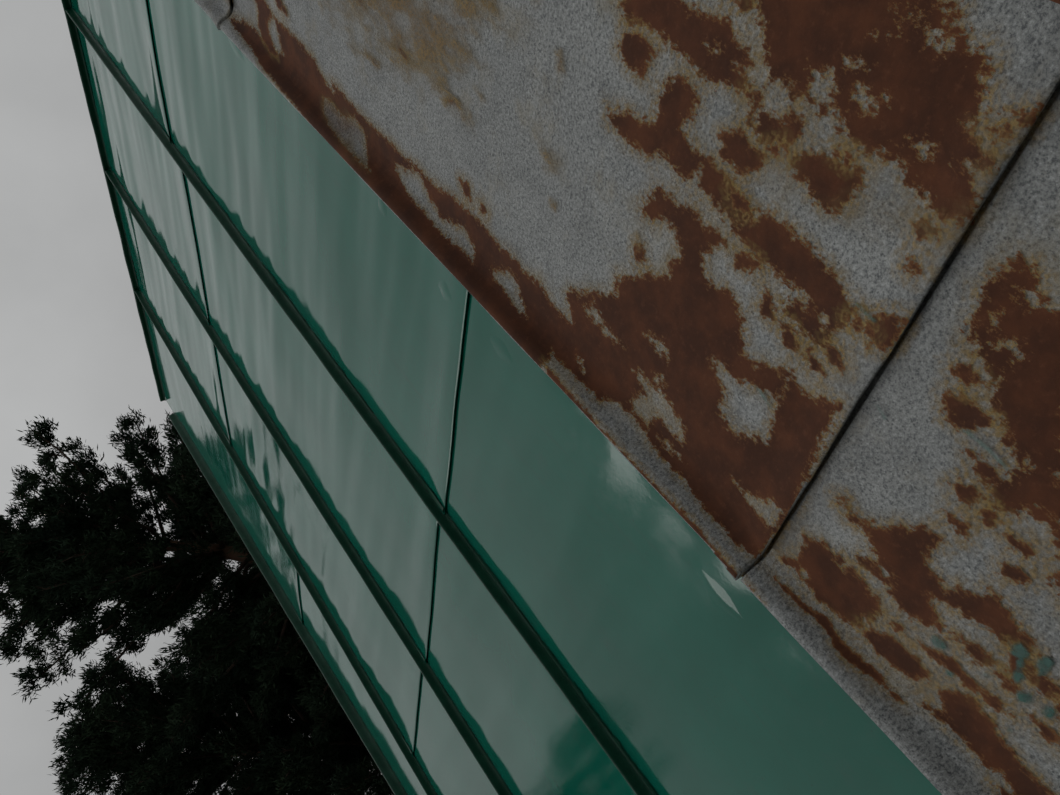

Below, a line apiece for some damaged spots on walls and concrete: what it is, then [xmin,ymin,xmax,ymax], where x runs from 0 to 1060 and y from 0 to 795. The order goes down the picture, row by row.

rust [229,0,1060,795]